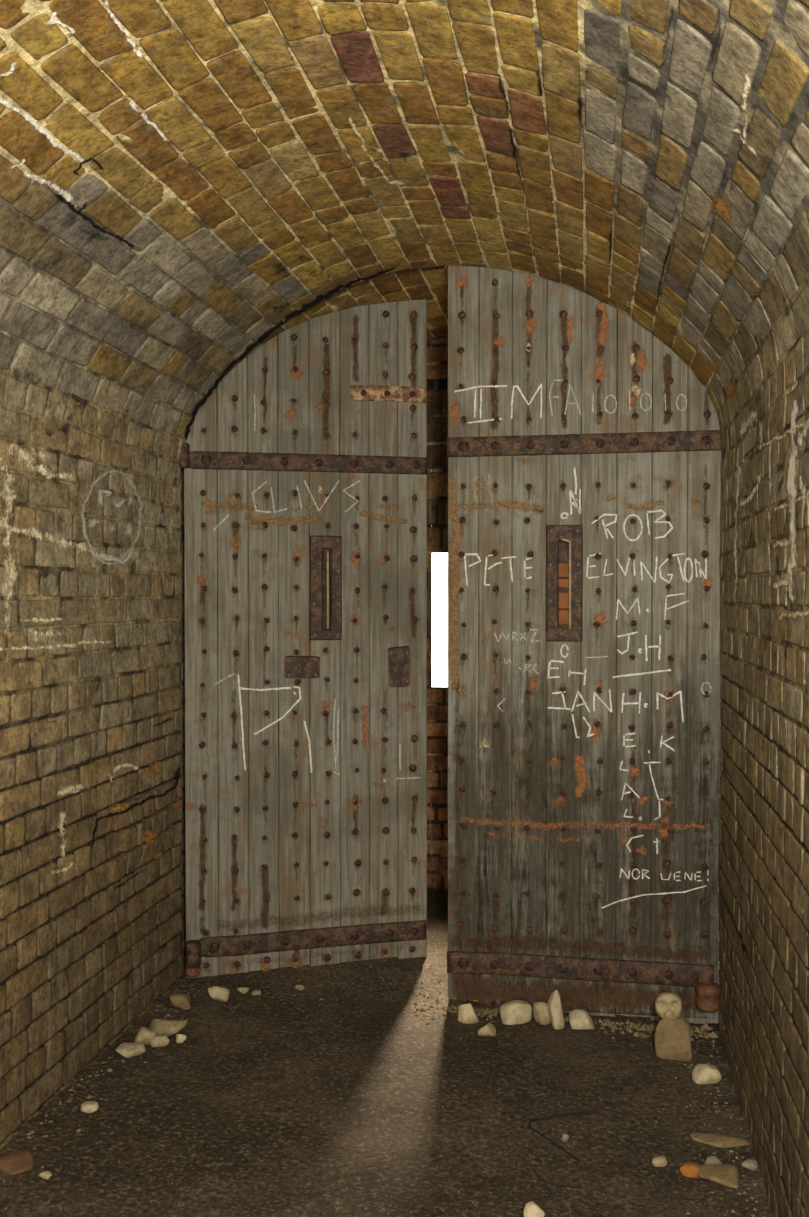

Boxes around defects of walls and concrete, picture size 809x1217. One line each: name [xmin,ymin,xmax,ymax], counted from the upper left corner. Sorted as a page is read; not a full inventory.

crack [499,76,522,178]
crack [536,70,544,96]
crack [577,97,585,128]
crack [55,158,138,248]
rust [490,309,506,430]
rust [525,275,536,424]
rust [561,316,573,429]
rust [594,302,609,424]
rust [627,343,646,411]
rust [663,355,672,423]
rust [454,709,707,962]
rust [454,974,707,1019]